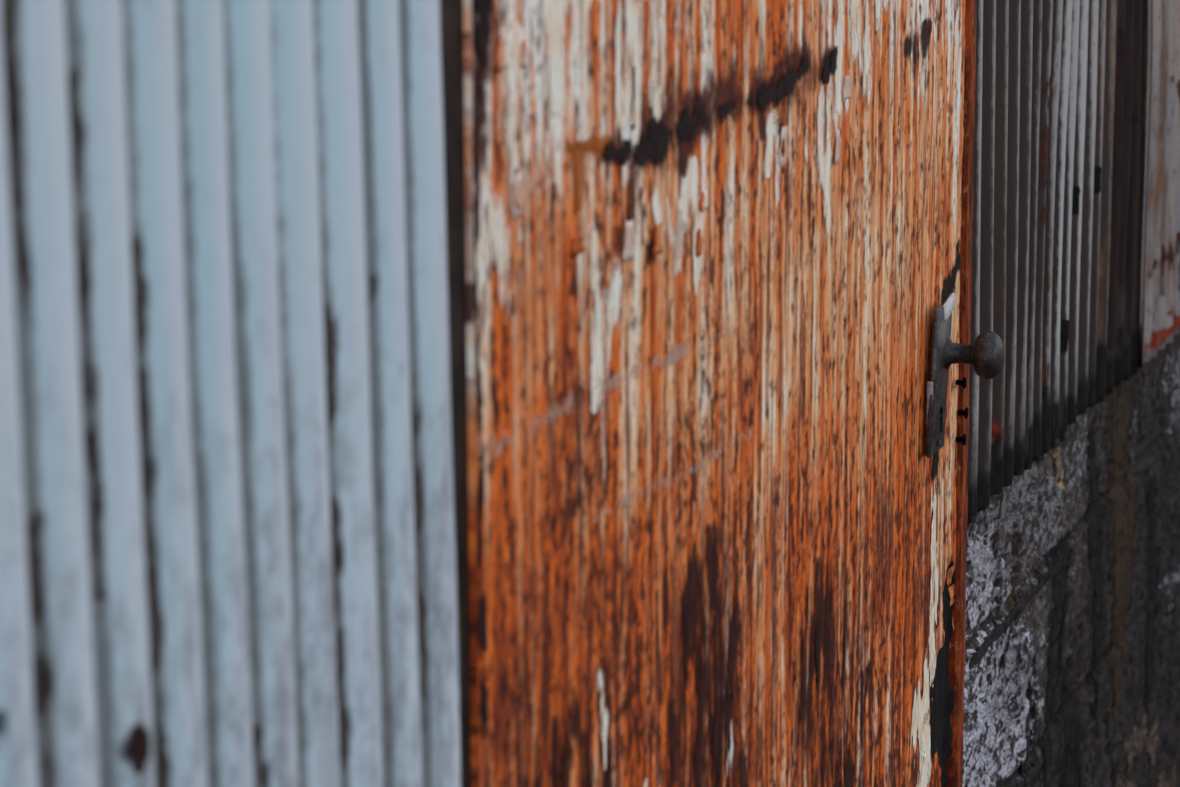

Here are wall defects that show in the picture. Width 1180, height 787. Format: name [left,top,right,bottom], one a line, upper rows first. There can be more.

rust [473,0,494,740]
peeling [484,21,529,316]
peeling [615,0,666,187]
peeling [572,156,709,414]
rust [566,41,838,240]
peeling [763,109,788,206]
peeling [805,0,888,235]
rust [904,18,932,71]
rust [121,723,151,774]
rust [664,525,749,787]
rust [793,558,878,787]
peeling [911,480,939,787]